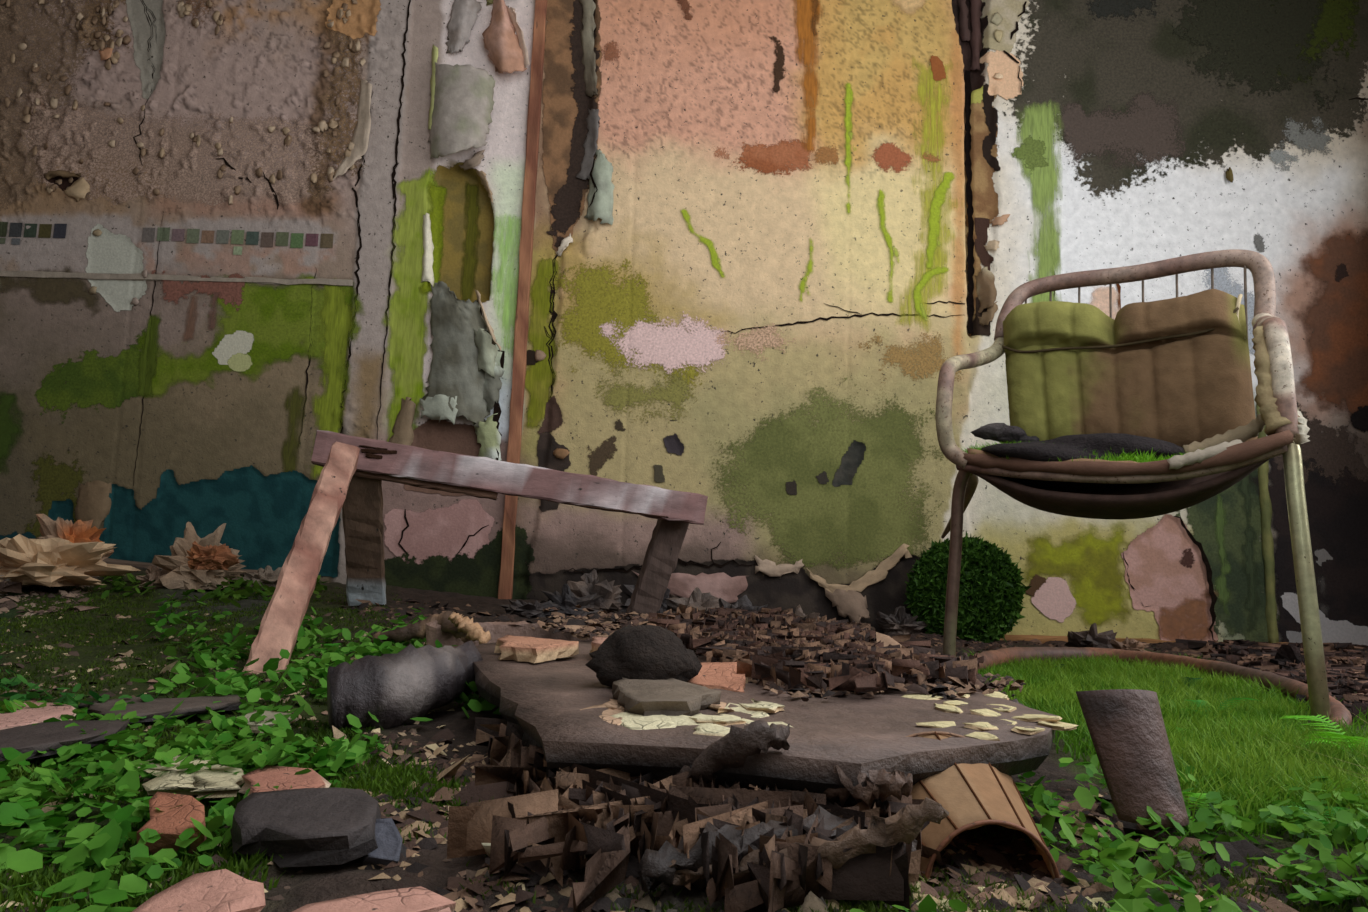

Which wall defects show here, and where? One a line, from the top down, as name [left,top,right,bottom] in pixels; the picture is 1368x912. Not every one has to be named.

flaking render [445,0,615,256]
crack [721,0,990,334]
water stain [1003,0,1368,204]
peeling [48,465,318,571]
water stain [282,285,353,472]
peeling [318,515,341,578]
peeling [411,162,505,461]
flaking render [668,544,920,633]
water stain [707,378,947,571]
water stain [1175,454,1303,643]
water stain [1296,401,1368,646]
corrosion [1300,230,1368,417]